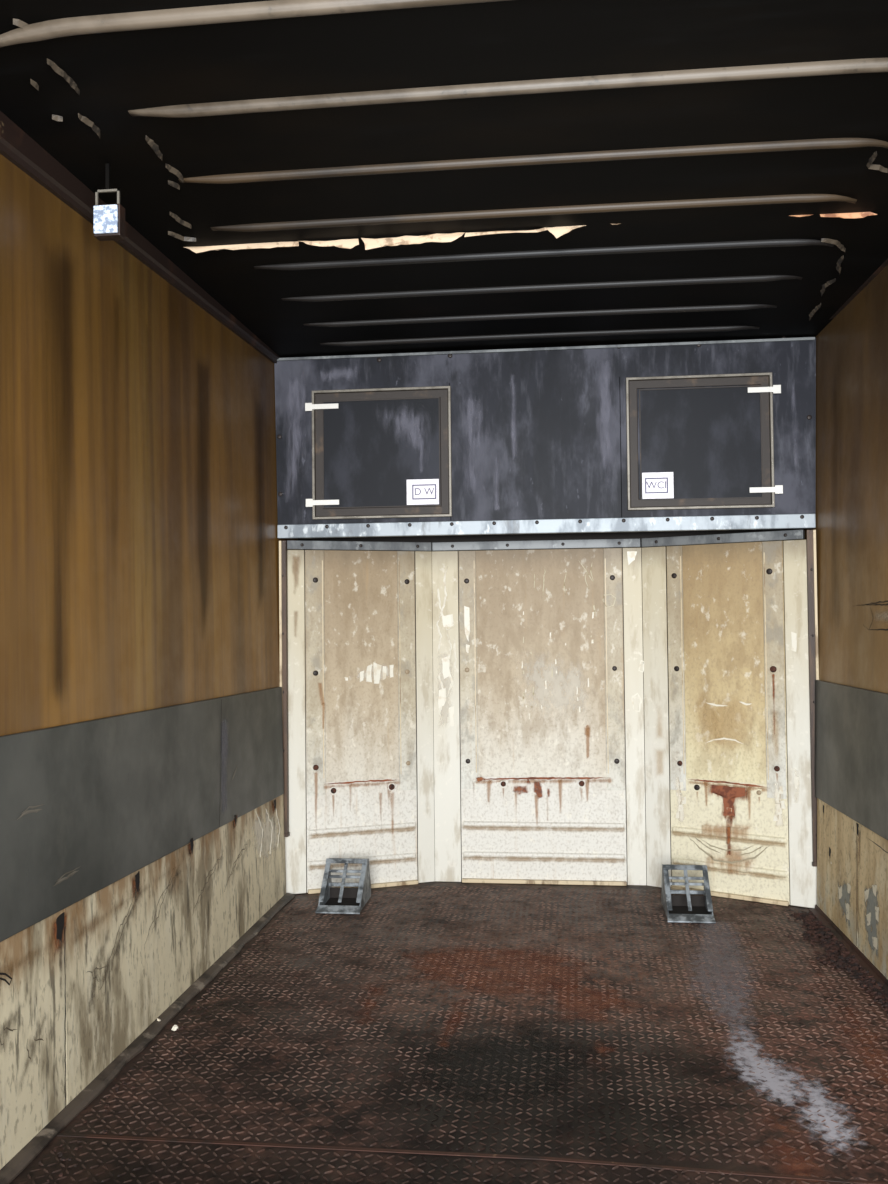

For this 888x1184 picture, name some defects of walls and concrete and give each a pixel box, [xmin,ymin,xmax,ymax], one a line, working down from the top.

peeling [145,135,184,190]
peeling [866,151,888,173]
peeling [168,212,586,253]
corrosion [476,777,602,798]
corrosion [688,779,763,855]
peeling [838,883,879,955]
water stain [728,1029,852,1149]